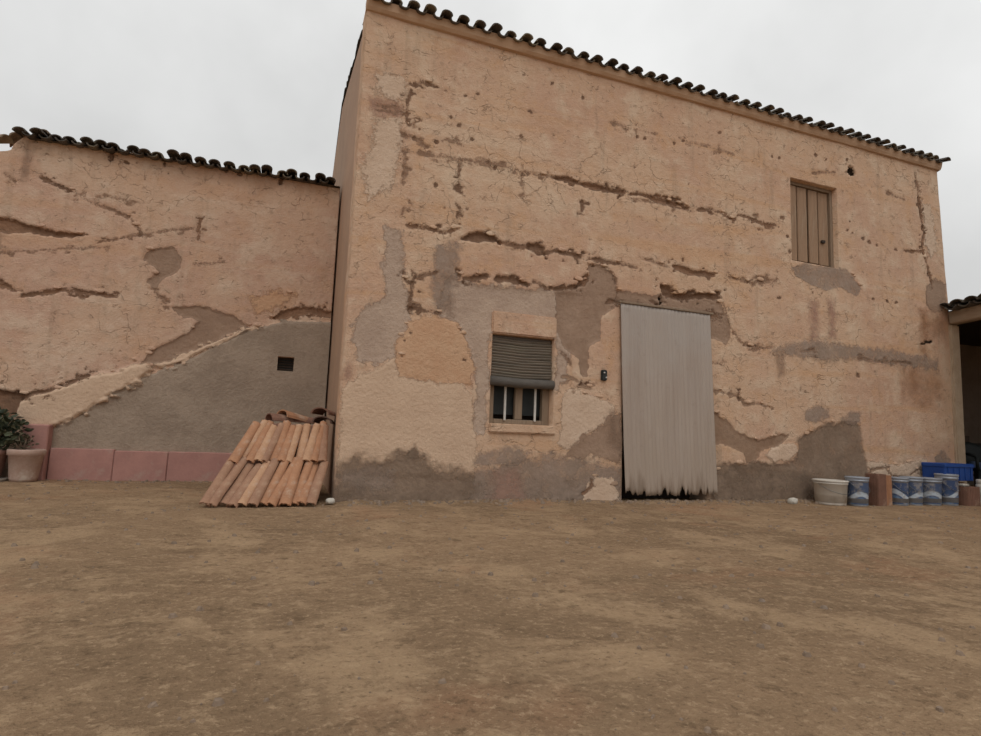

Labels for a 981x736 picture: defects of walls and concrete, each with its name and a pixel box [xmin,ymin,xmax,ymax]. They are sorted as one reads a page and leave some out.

spalling [0,217,88,239]
crack [398,78,781,351]
crack [861,175,933,289]
flaking render [141,246,332,364]
flaking render [349,225,413,367]
flaking render [437,260,730,435]
crack [858,354,913,365]
flaking render [714,410,789,463]